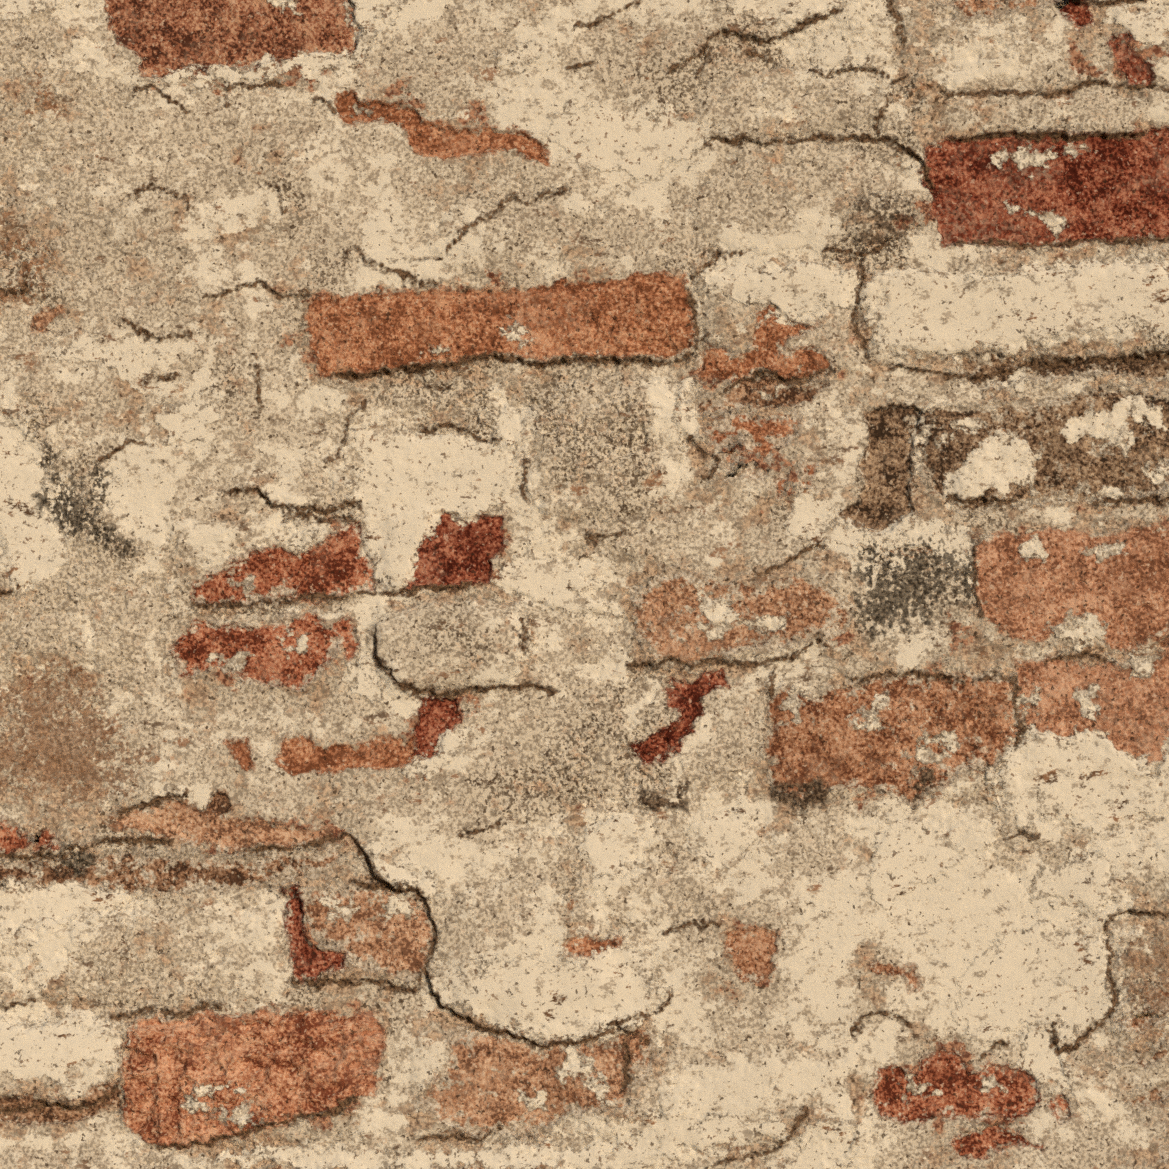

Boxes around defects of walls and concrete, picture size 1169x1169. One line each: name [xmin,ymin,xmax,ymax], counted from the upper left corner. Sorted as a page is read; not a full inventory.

spalling [104,0,415,102]
crack [666,7,844,78]
crack [886,0,907,47]
crack [703,63,1169,193]
crack [1072,0,1147,8]
peeling [0,395,71,601]
peeling [168,405,855,771]
spalling [304,125,1169,1160]
spalling [0,789,449,990]
spalling [0,927,866,1169]
crack [243,832,674,1092]
crack [1046,907,1169,1055]